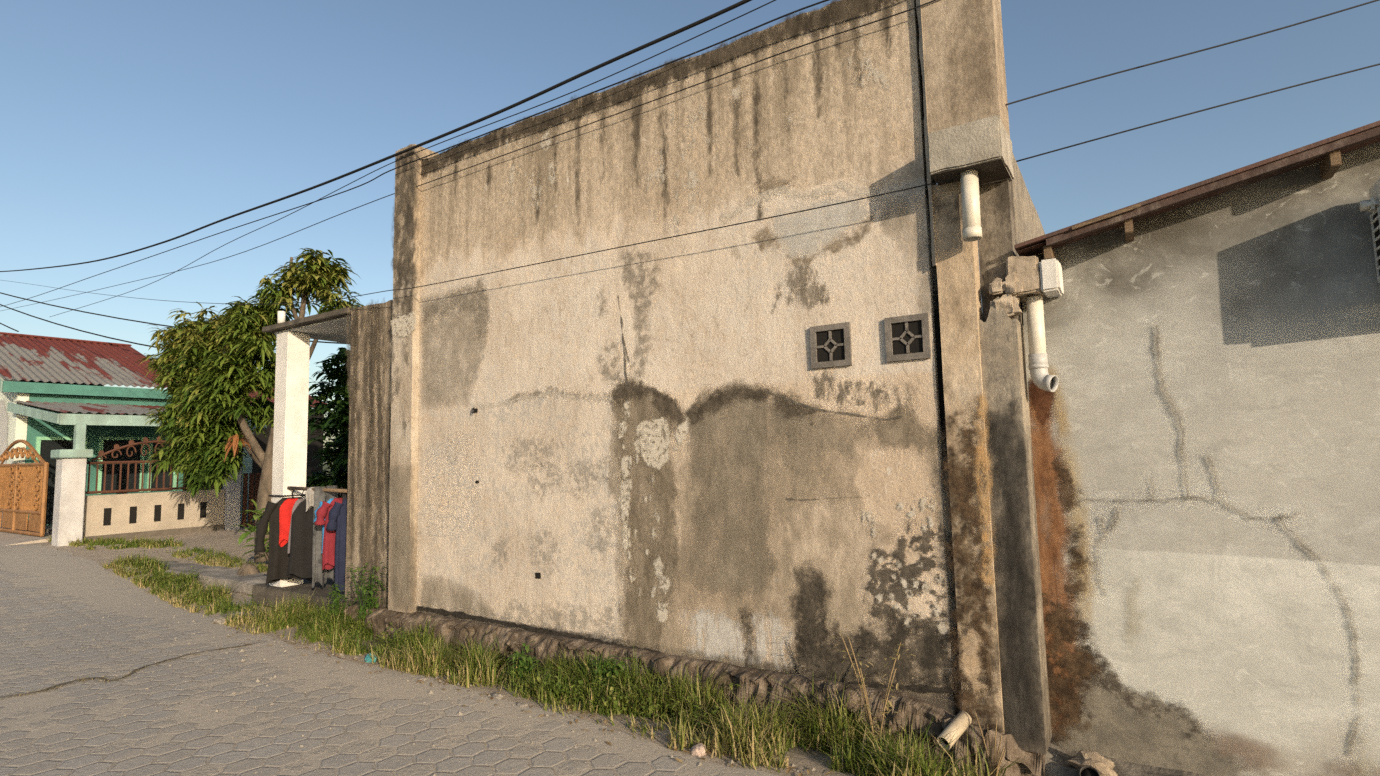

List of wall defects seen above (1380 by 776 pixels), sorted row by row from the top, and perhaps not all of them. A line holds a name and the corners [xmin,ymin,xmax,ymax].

damp [346,0,898,615]
crack [2,642,259,697]
peeling [618,402,792,666]
spalling [863,510,985,693]
damp [603,253,1271,776]
rust [1028,372,1089,732]